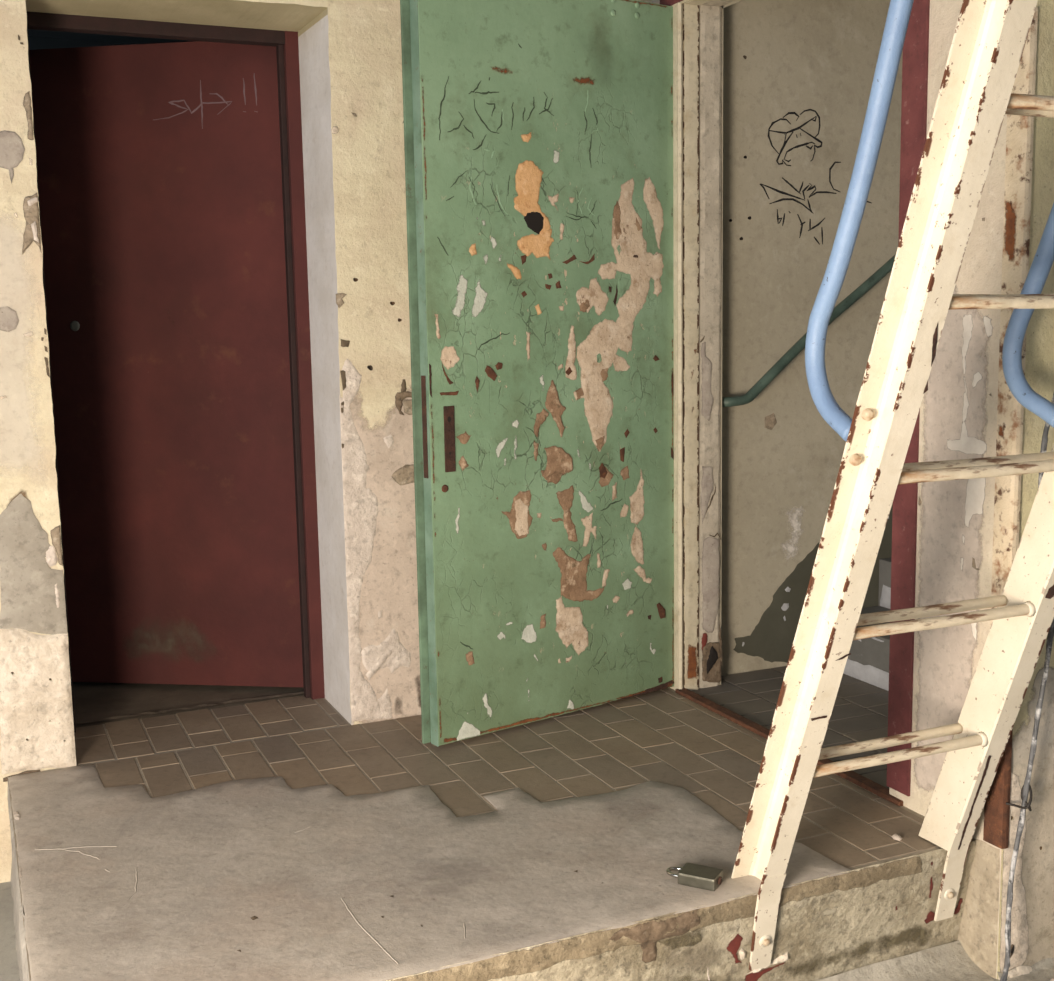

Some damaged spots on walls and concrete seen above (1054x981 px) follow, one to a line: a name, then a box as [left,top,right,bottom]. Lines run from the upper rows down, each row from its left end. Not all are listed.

peeling [0,193,41,465]
spalling [336,293,347,308]
rust [1004,201,1017,261]
spalling [50,525,63,566]
flaking render [340,339,421,723]
flaking render [954,667,1054,979]